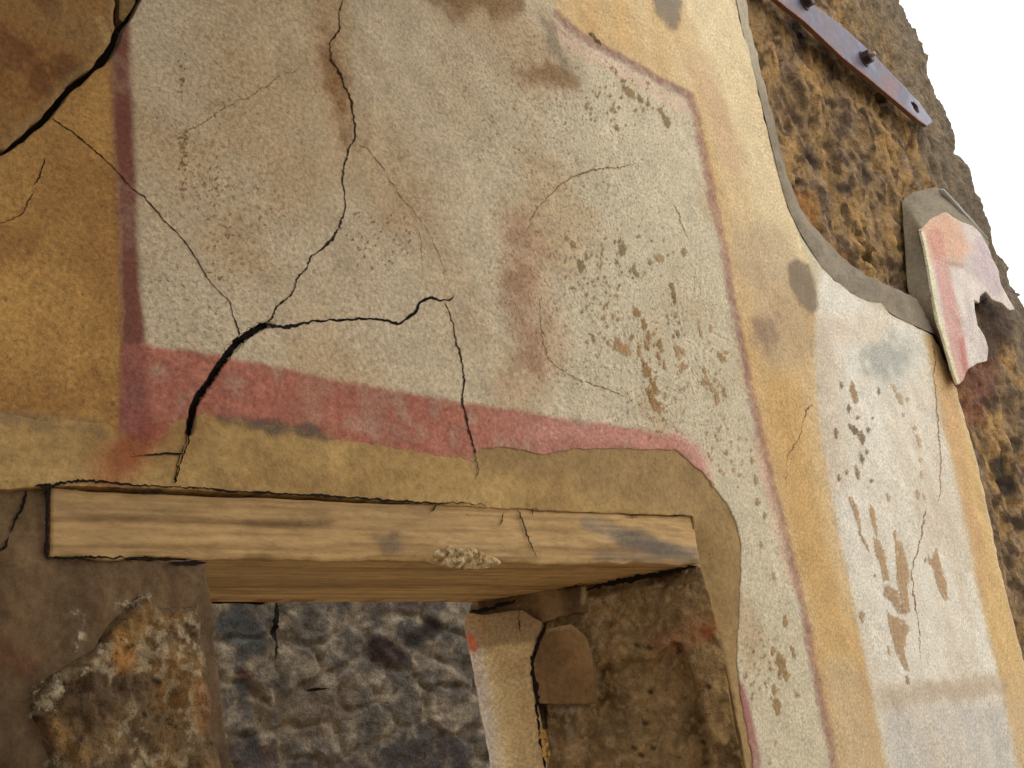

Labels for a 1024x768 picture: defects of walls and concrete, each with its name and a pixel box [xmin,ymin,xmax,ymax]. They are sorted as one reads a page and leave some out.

peeling [585,67,671,130]
crack [0,0,536,566]
peeling [564,226,758,488]
flaking render [736,0,1024,684]
crack [470,599,546,768]
peeling [741,631,796,715]